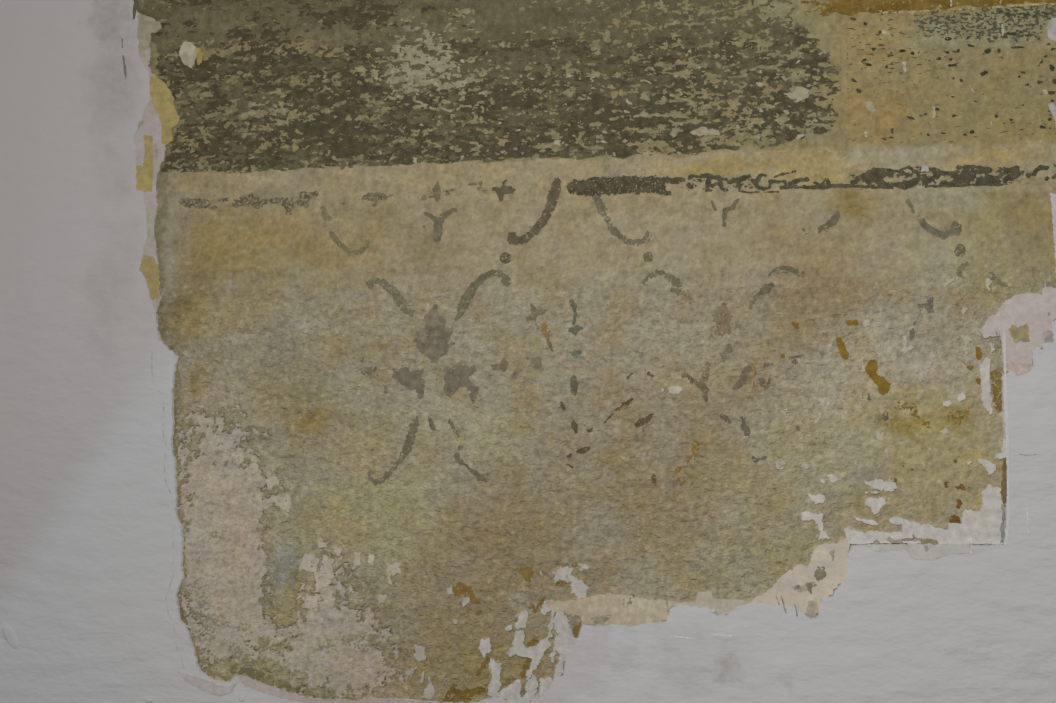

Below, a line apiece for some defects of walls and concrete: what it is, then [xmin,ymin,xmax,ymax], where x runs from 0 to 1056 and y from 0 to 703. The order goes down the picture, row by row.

peeling [478,193,1056,703]